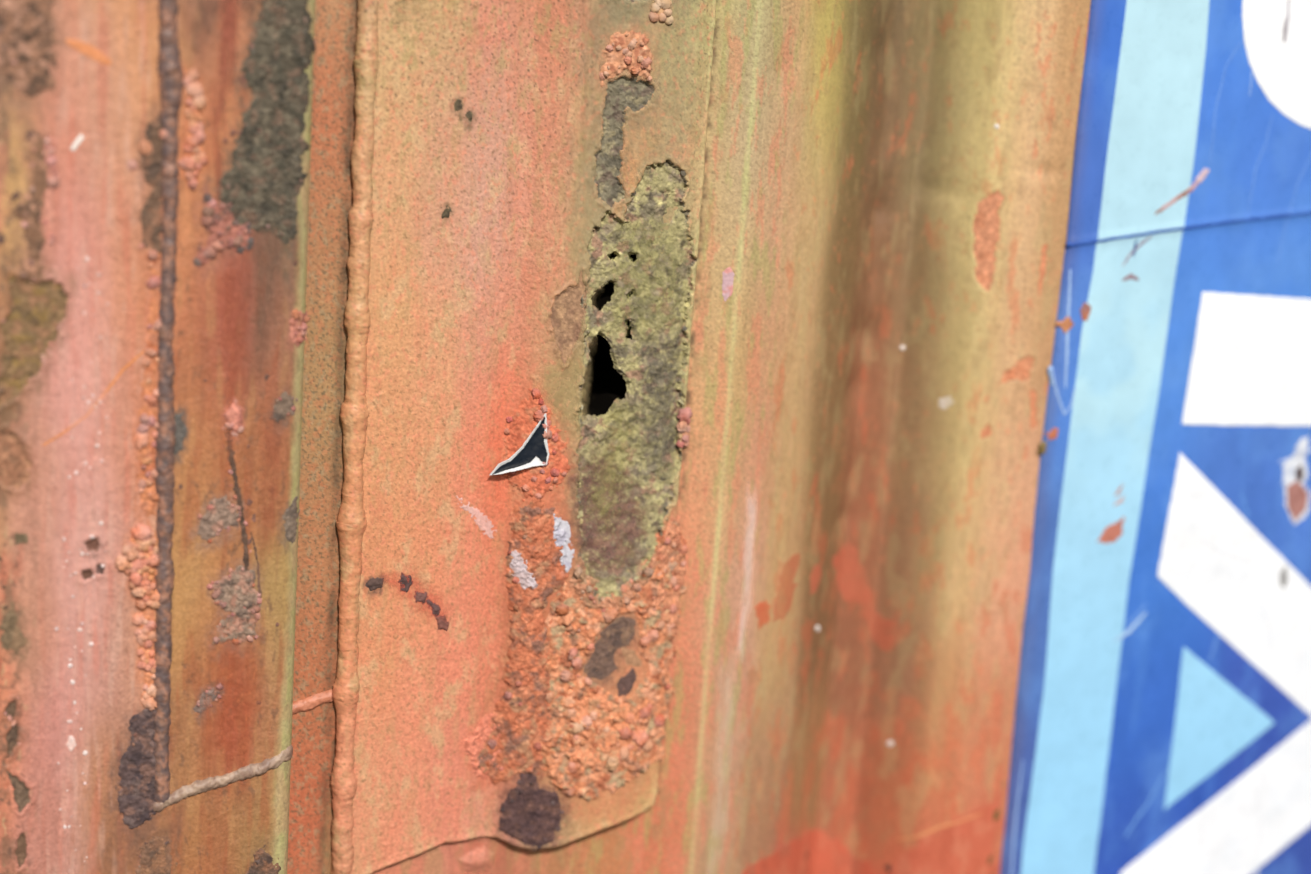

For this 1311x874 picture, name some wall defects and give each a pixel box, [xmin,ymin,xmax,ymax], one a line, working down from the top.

rust [0,0,62,99]
rust [11,130,61,282]
peeling [972,190,1004,292]
peeling [1196,168,1210,184]
rust [115,0,316,829]
rust [461,0,698,852]
rust [14,533,28,545]
rust [0,602,28,655]
rust [246,845,281,874]